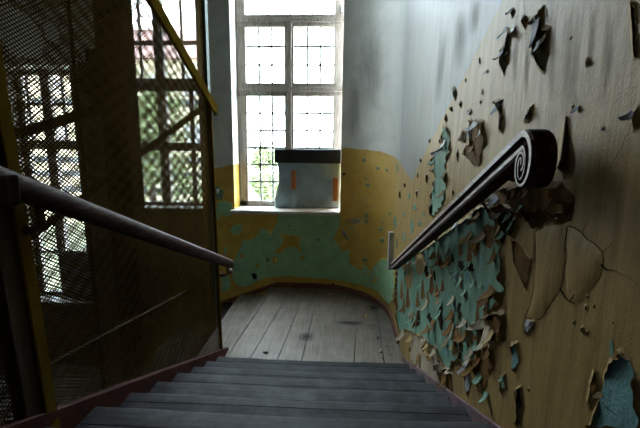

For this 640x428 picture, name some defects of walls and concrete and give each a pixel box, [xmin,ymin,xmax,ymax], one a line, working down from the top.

peeling [492,5,551,76]
peeling [220,86,581,403]
crack [522,202,638,336]
peeling [585,339,640,428]